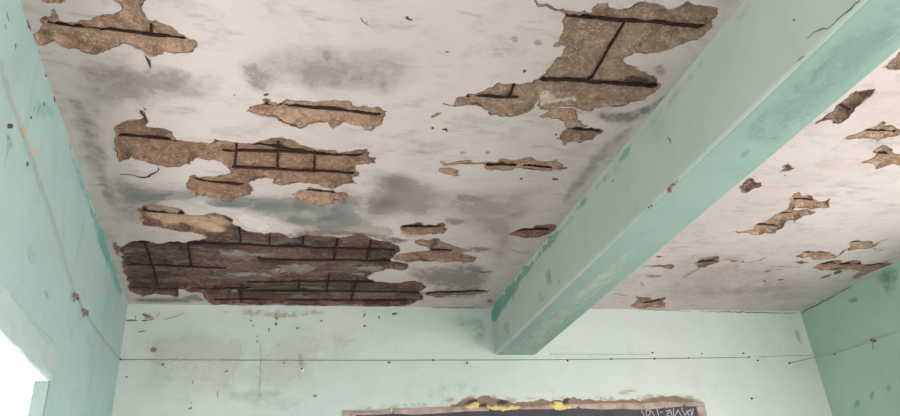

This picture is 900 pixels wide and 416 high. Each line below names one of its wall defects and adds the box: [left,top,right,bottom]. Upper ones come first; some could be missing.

spalling [34,0,198,57]
leakage [97,70,192,98]
spalling [431,0,718,145]
spalling [815,89,875,124]
spalling [114,110,376,206]
spalling [844,121,900,169]
leakage [80,180,121,292]
leakage [101,175,431,231]
spalling [736,192,830,235]
spalling [112,204,493,332]
leakage [416,266,481,297]
peeling [450,395,694,411]